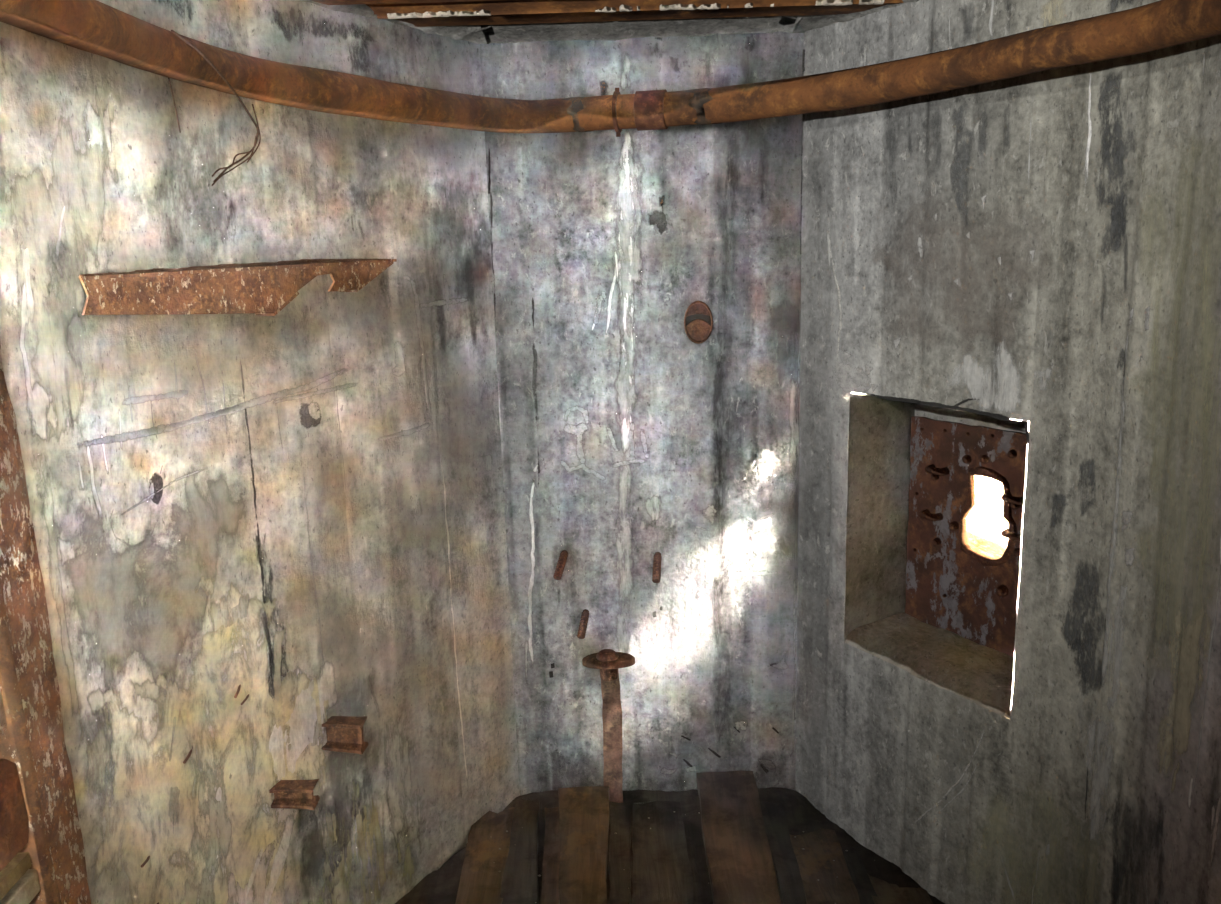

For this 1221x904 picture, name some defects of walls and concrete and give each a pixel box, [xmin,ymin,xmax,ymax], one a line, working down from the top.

water stain [1096,75,1134,288]
crack [240,360,289,716]
water stain [1051,495,1068,527]
water stain [1080,460,1095,515]
water stain [1062,567,1104,692]